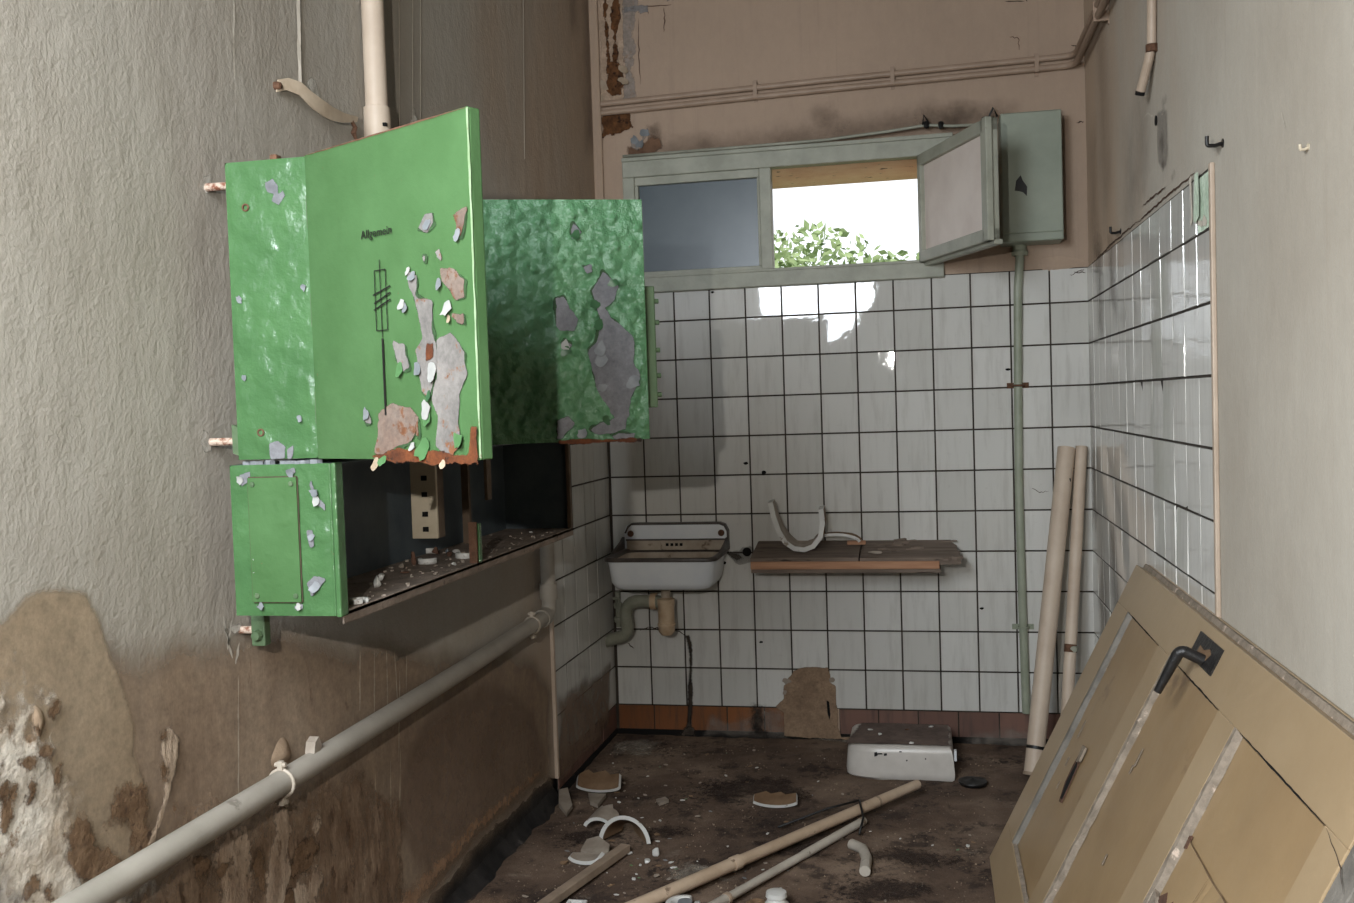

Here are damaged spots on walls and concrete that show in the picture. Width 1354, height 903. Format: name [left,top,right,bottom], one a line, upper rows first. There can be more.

flaking render [0,690,170,903]
damp [0,590,459,861]
damp [121,657,610,903]